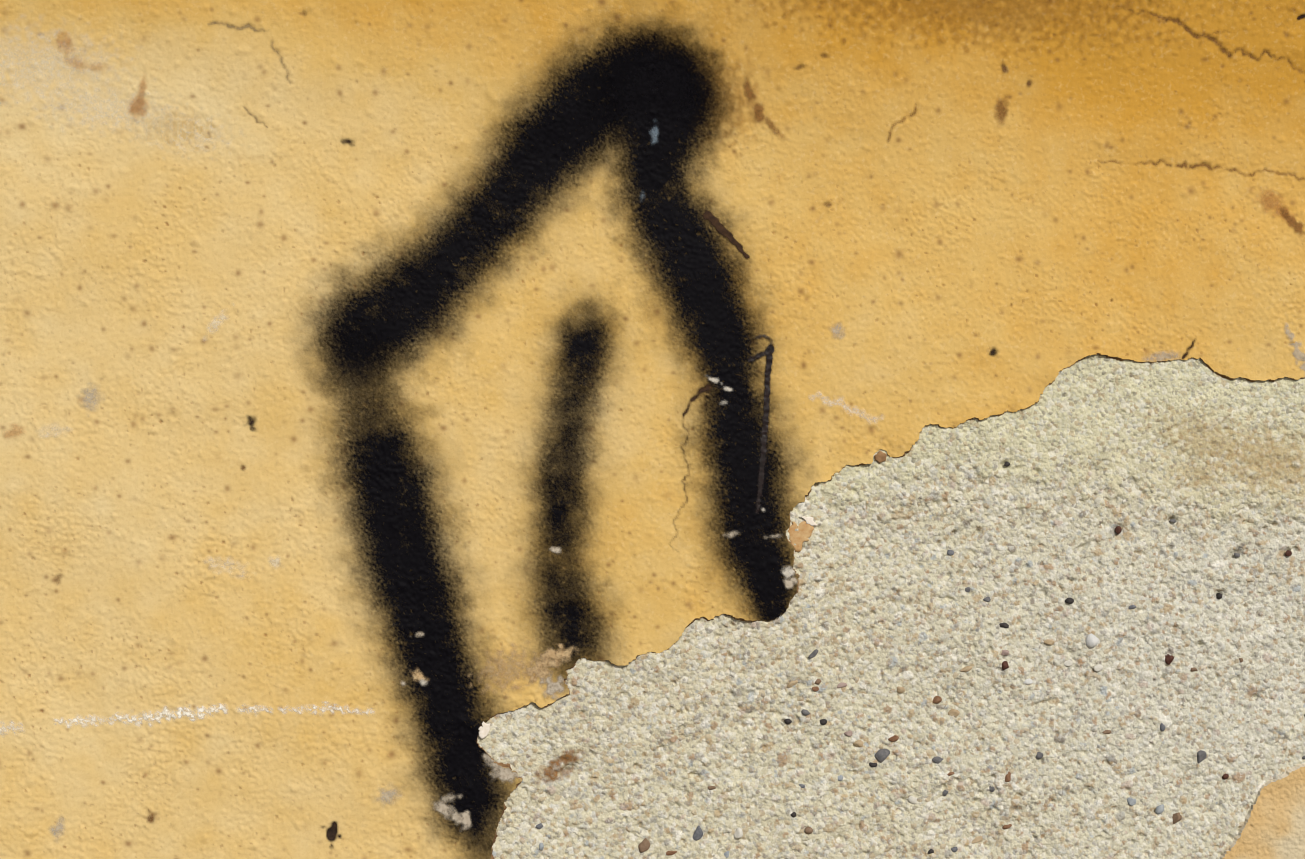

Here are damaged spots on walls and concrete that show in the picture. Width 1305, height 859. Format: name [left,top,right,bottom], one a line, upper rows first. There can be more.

crack [1152,14,1291,63]
spalling [477,353,1305,859]